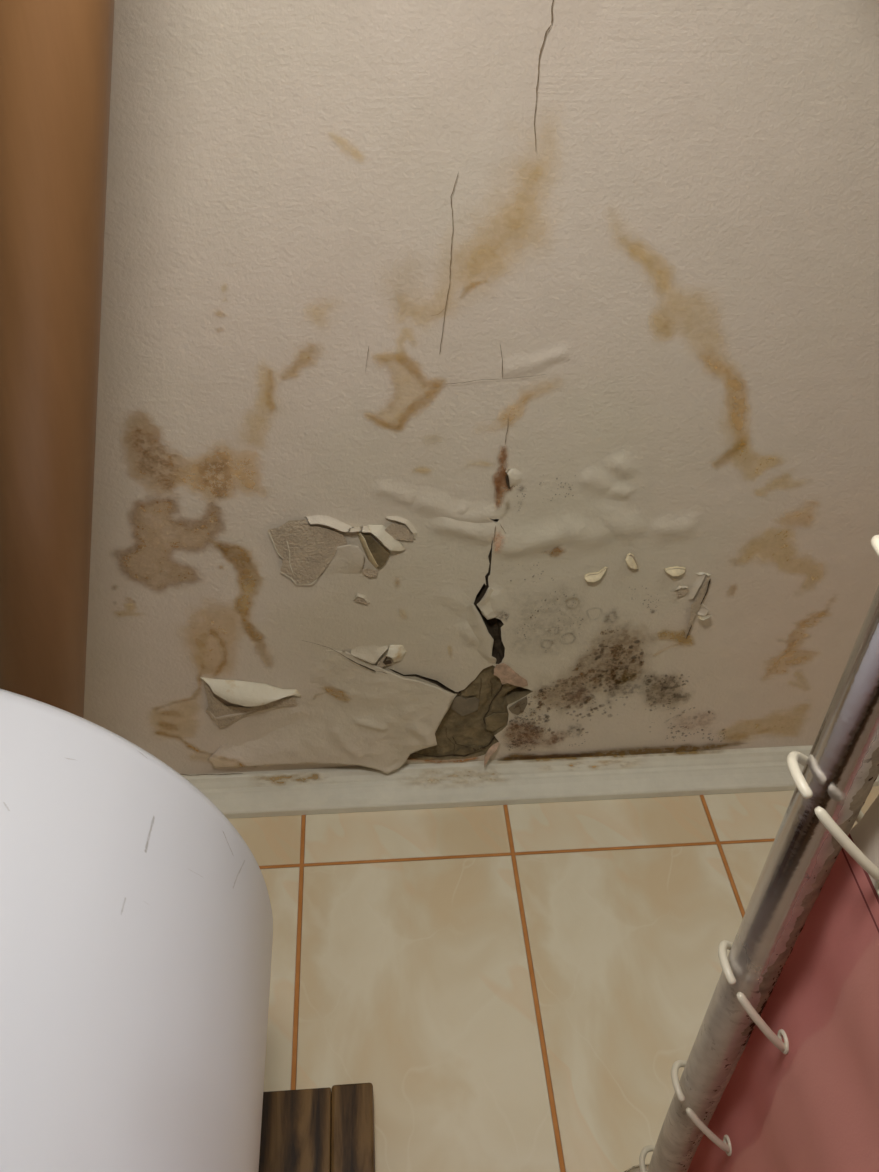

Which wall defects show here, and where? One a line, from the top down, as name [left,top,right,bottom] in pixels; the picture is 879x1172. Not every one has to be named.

crack [534,0,554,147]
peeling [268,515,418,585]
crack [474,519,505,664]
peeling [200,588,533,774]
crack [302,640,461,694]
leakage [499,619,742,767]